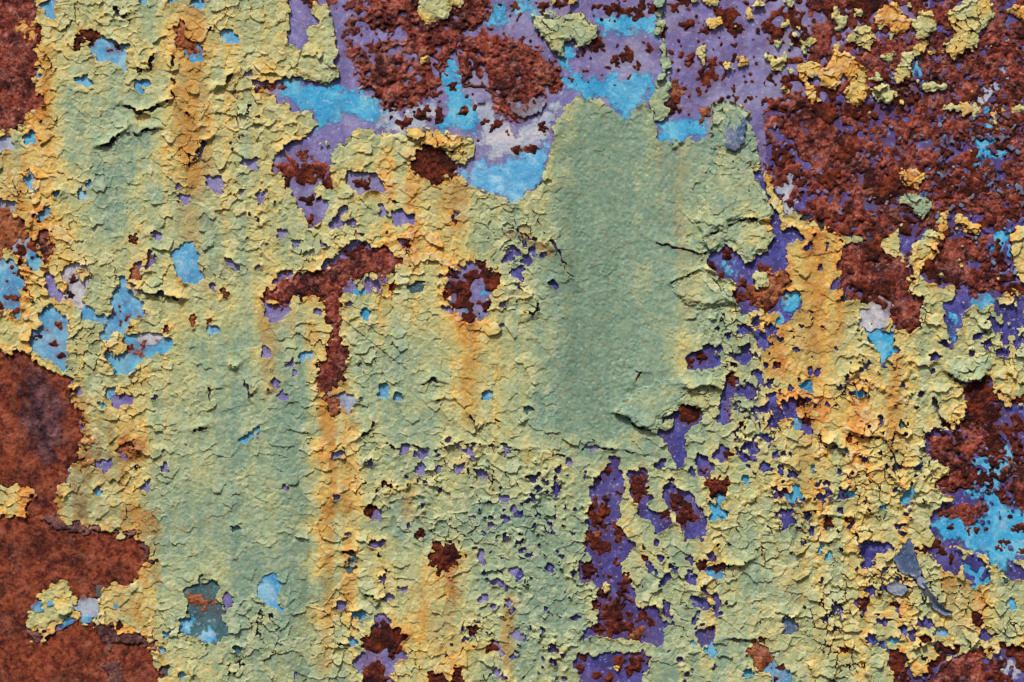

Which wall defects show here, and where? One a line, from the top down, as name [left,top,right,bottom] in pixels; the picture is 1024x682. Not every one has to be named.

corrosion [353,0,564,123]
peeling [0,129,36,151]
spalling [204,174,225,195]
corrosion [748,0,1024,449]
peeling [0,190,179,410]
spalling [189,314,221,337]
corrosion [260,239,403,485]
corrosion [438,254,507,324]
peeling [235,0,1024,682]
corrosion [0,349,165,682]
spalling [92,439,140,474]
spalling [139,462,169,493]